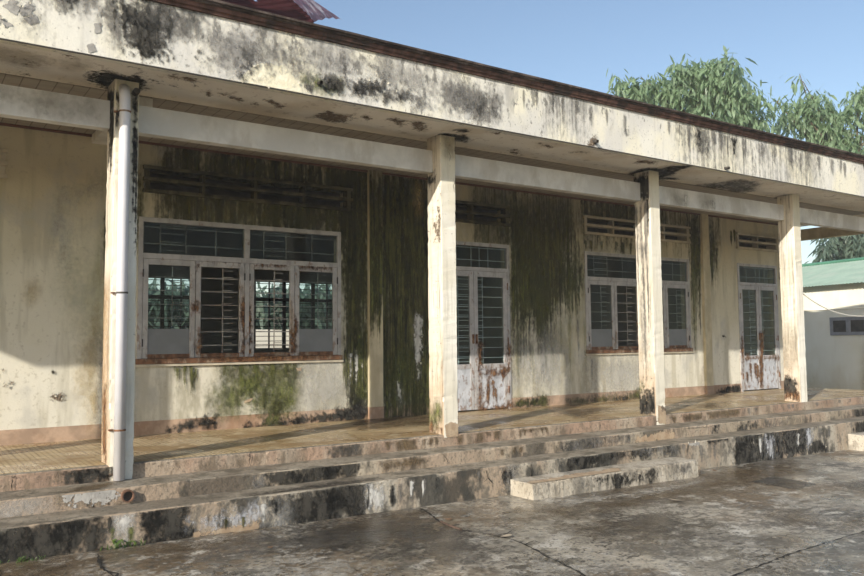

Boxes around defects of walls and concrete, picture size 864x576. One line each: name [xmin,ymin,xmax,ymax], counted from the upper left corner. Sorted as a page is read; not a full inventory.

peeling [0,0,39,27]
peeling [87,23,102,53]
leakage [195,30,300,82]
leakage [56,0,201,240]
mould [327,50,501,134]
corrosion [196,298,325,362]
corrosion [478,341,513,410]
corrosion [741,332,779,388]
leakage [520,408,830,541]
crack [97,554,119,576]
leakage [0,444,516,575]
crack [421,509,585,576]